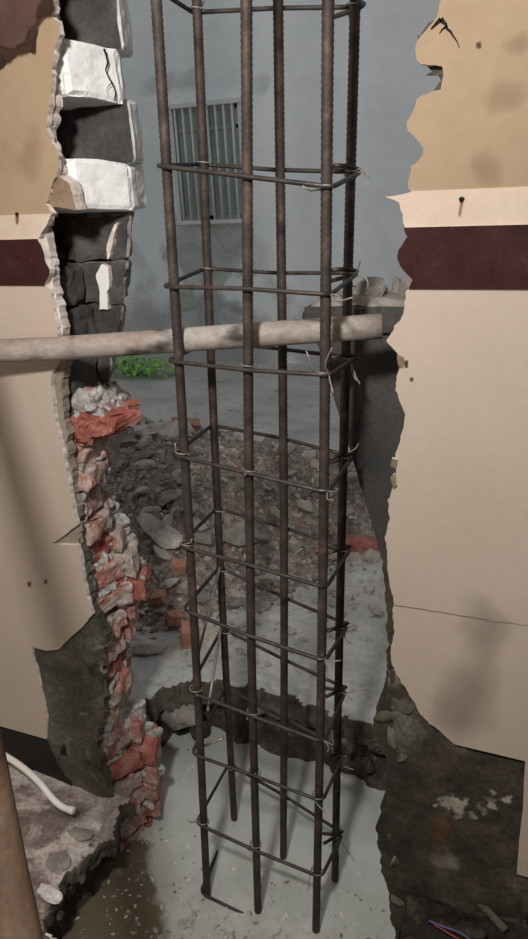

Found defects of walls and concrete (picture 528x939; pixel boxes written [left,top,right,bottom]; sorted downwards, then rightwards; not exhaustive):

crack [431,17,460,48]
crack [103,49,116,101]
peeling [397,355,413,381]
spalling [54,521,84,544]
crack [393,605,528,626]
spalling [34,619,114,798]
spalling [379,666,525,929]
damp [434,790,512,819]